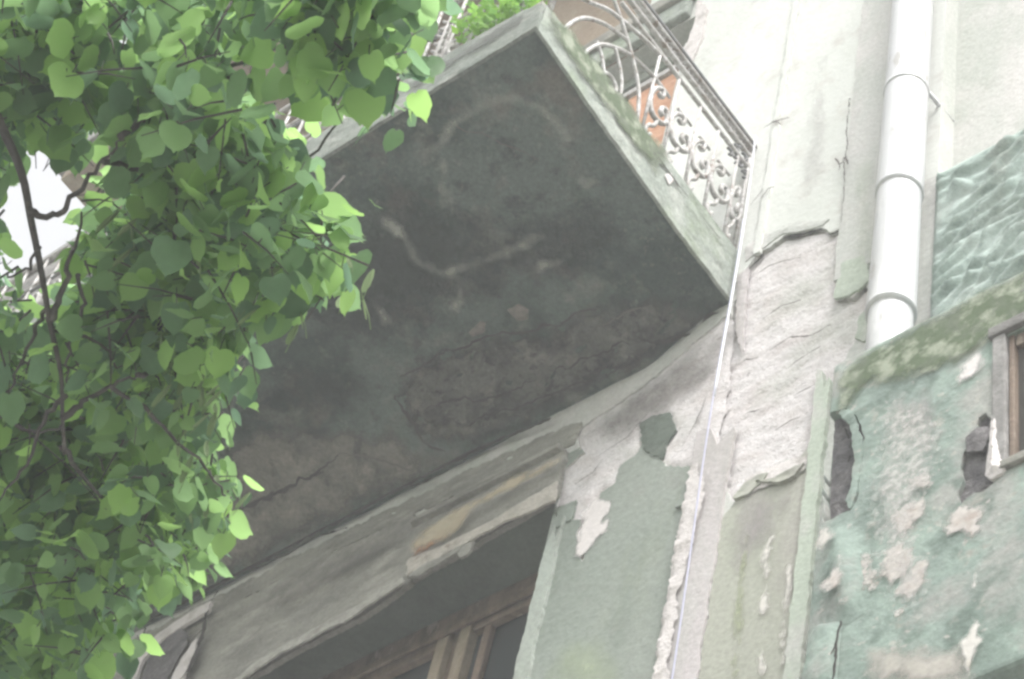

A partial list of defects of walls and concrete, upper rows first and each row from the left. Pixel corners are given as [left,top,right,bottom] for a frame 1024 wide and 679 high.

crack [749,98,851,269]
water stain [959,353,981,381]
crack [136,418,551,679]
spalling [204,219,869,679]
peeling [861,474,930,597]
spalling [946,417,994,537]
crack [830,621,842,679]